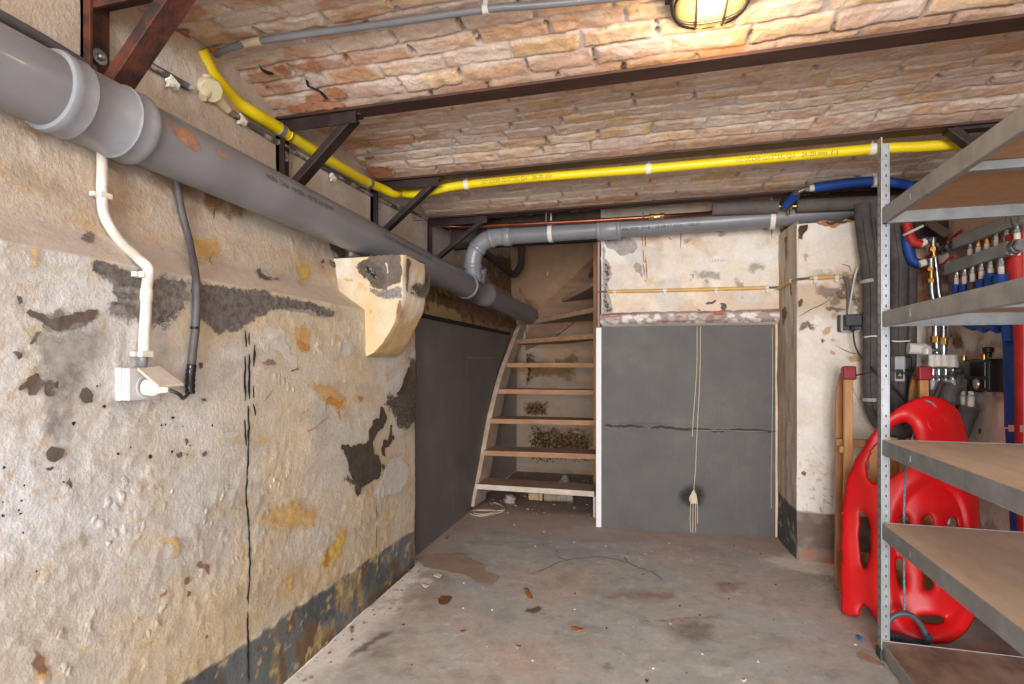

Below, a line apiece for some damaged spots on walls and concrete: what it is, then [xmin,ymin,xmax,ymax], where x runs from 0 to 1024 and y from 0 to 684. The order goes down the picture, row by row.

peeling [13,296,99,360]
peeling [19,373,59,397]
damp [526,354,577,383]
peeling [341,357,417,499]
damp [524,402,592,462]
crack [604,424,776,433]
crack [244,330,273,683]